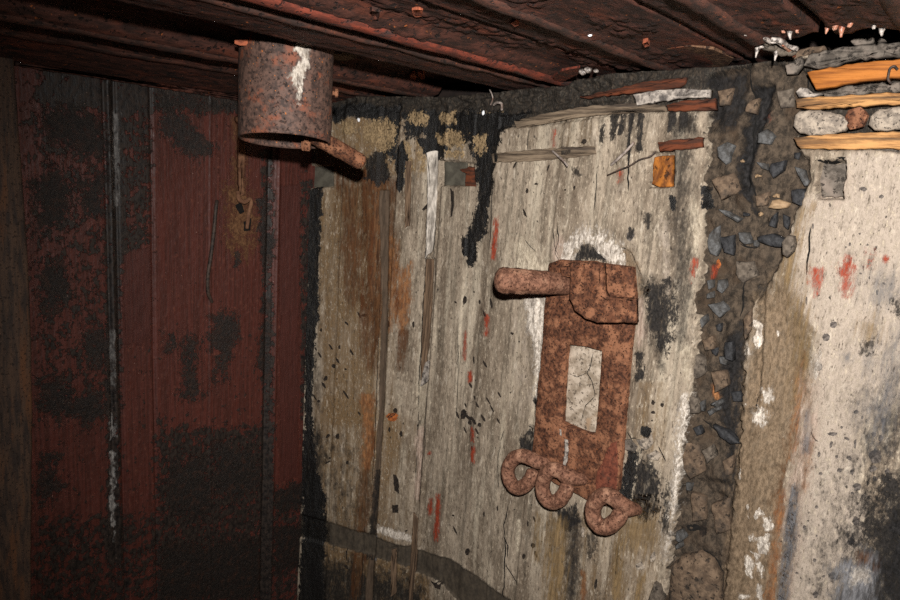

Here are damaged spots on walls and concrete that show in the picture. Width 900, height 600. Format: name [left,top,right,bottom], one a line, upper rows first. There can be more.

damp [108,413,117,537]
damp [298,187,329,600]
damp [332,100,532,268]
damp [535,502,597,600]
damp [612,150,716,600]
spalling [648,62,812,600]